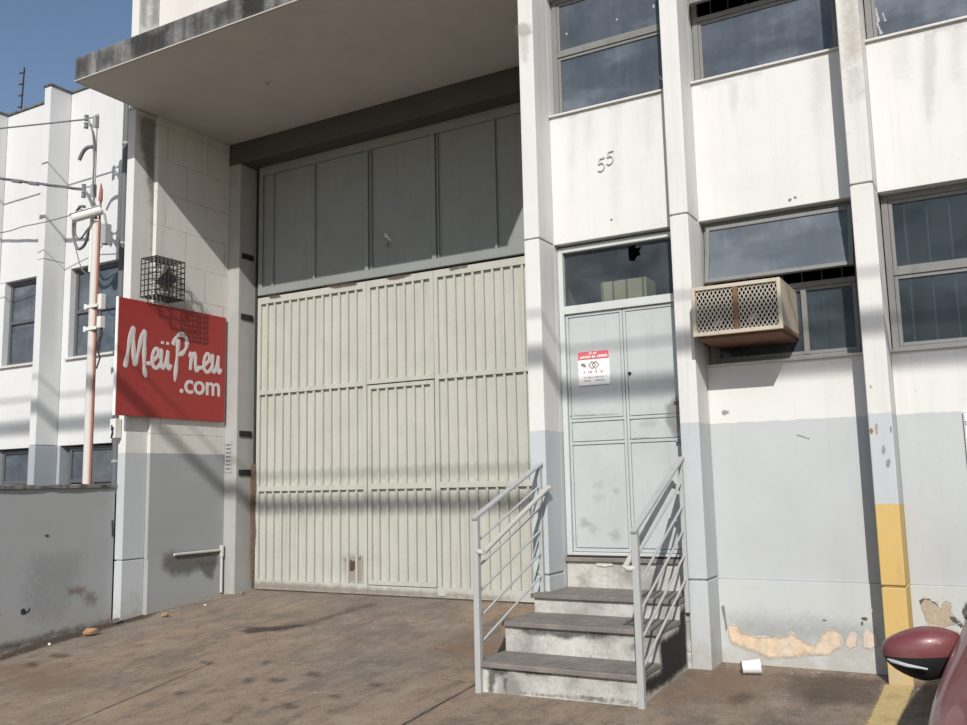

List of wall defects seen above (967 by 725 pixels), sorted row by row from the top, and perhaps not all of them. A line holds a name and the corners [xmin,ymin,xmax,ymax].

damp [243,0,260,18]
damp [131,26,168,56]
damp [165,554,216,577]
peeling [919,597,967,635]
peeling [722,606,879,659]